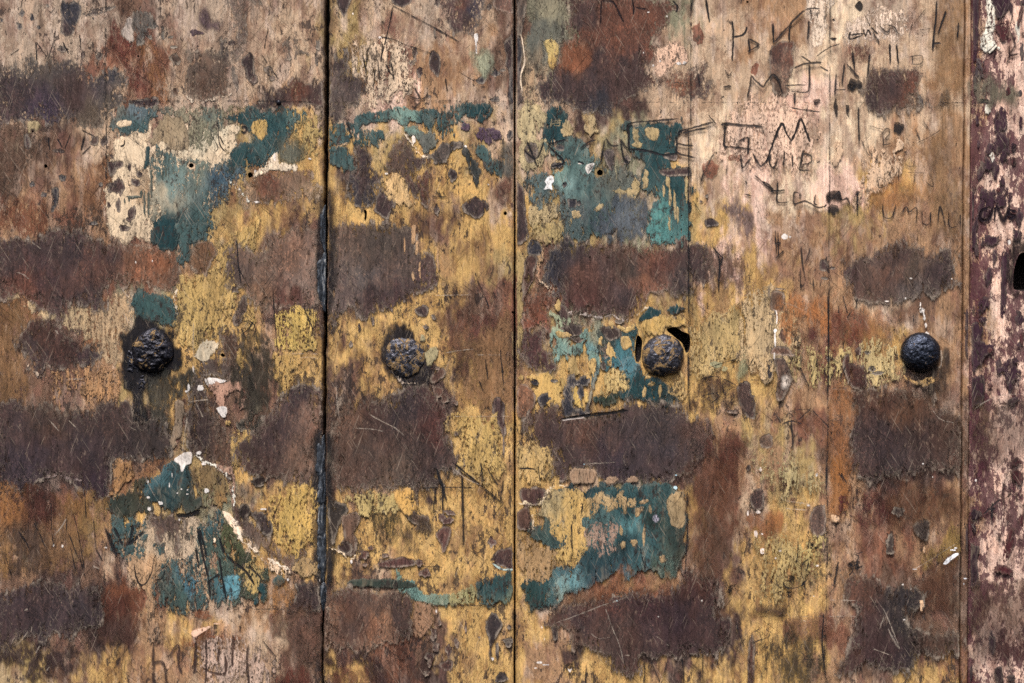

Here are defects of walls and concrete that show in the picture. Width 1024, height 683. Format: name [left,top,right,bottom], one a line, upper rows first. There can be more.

peeling [1009,0,1024,61]
peeling [0,0,470,578]
peeling [435,0,719,549]
peeling [965,140,1024,327]
corrosion [118,315,182,426]
corrosion [381,310,496,387]
peeling [988,311,1024,406]
peeling [1010,456,1024,486]
peeling [487,536,513,571]
peeling [992,564,1013,576]